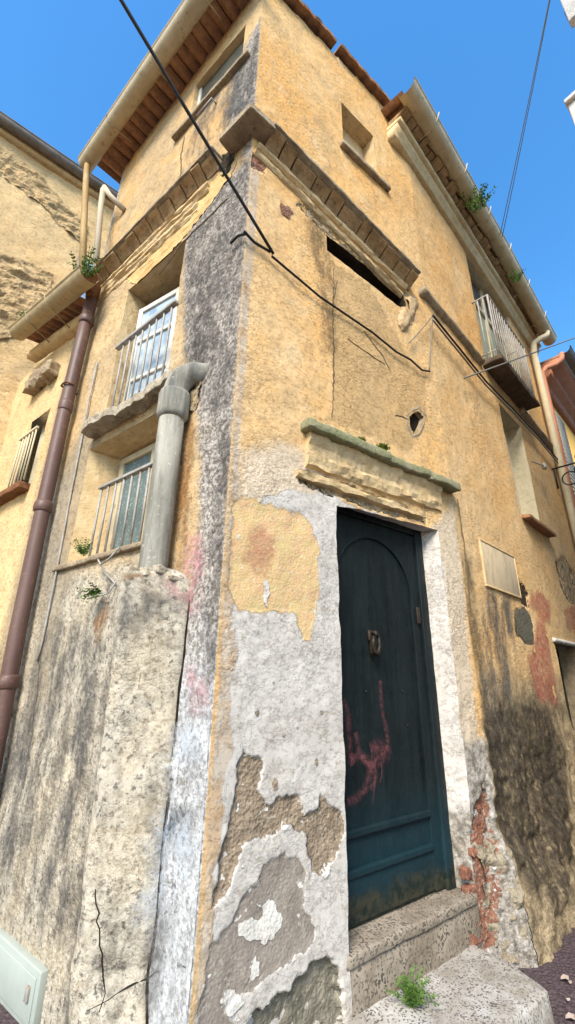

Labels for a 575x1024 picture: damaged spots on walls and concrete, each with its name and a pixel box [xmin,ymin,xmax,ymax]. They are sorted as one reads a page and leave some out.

peeling [228,497,320,641]
water stain [0,622,109,939]
crack [87,600,190,1024]
peeling [197,749,344,1024]
spalling [460,784,529,964]
water stain [464,560,574,911]